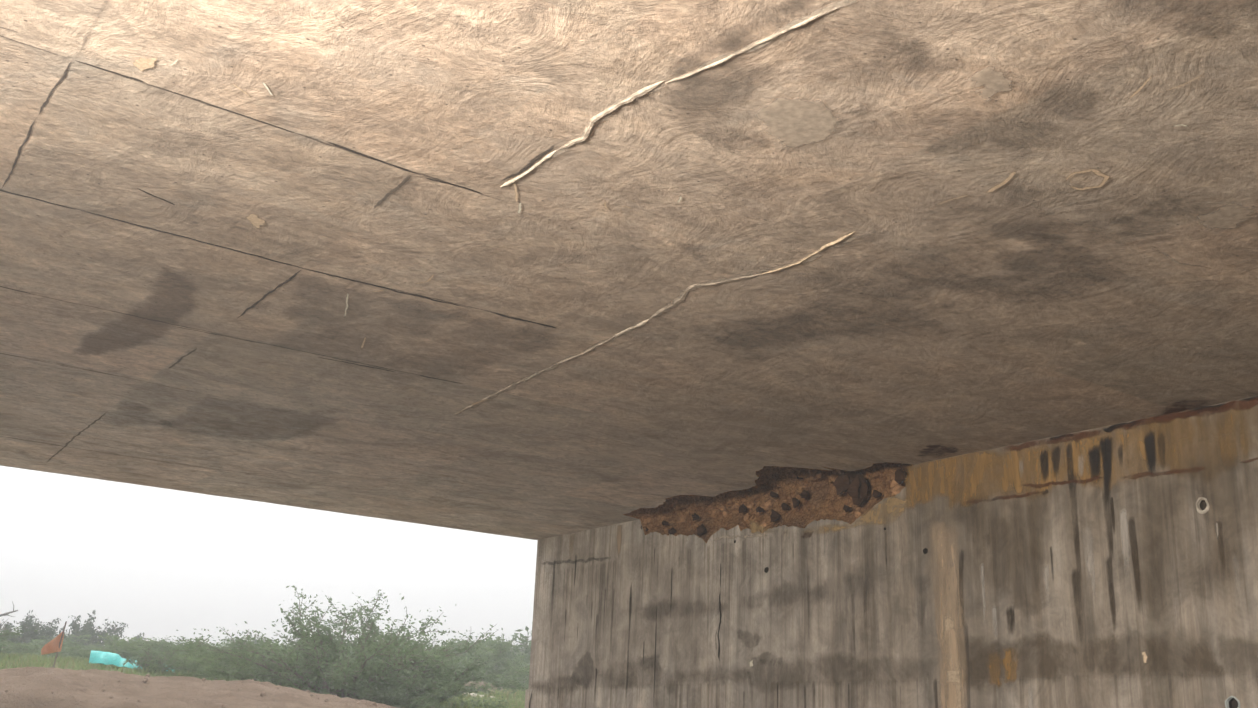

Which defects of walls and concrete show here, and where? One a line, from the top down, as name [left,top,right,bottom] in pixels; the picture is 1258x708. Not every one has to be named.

crack [501,0,852,187]
spalling [623,462,913,543]